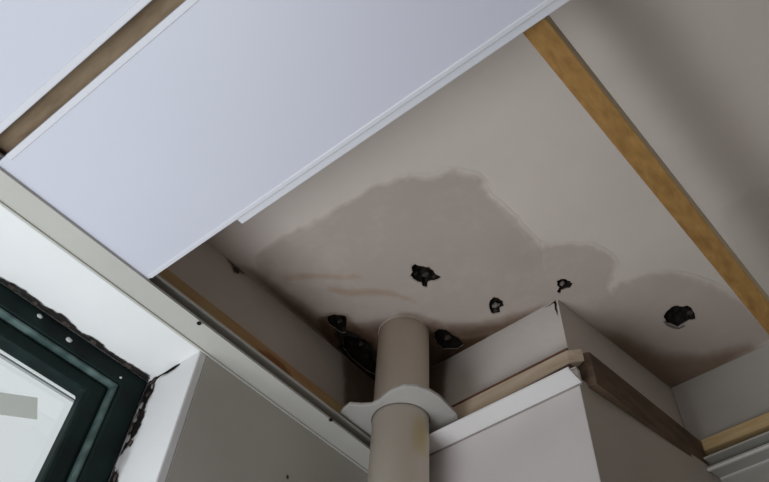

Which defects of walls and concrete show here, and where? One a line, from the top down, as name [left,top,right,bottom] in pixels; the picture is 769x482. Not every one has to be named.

damp [252,166,769,403]